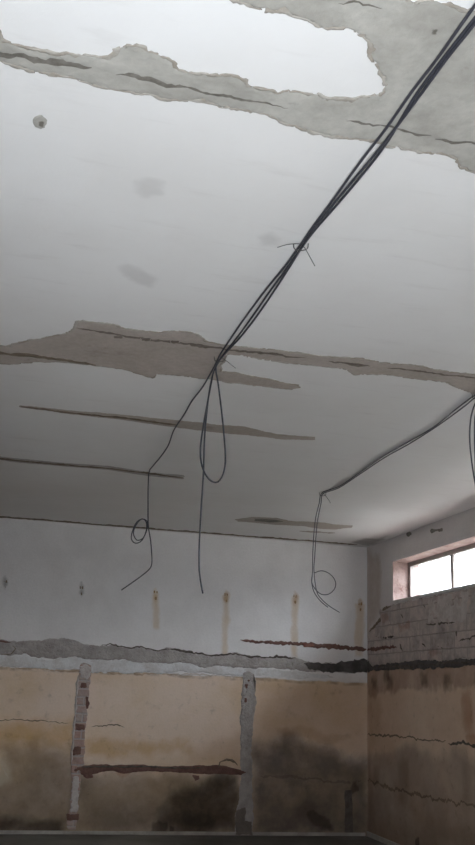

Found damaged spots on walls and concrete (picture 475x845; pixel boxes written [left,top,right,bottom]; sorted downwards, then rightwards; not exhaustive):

spalling [0,0,475,174]
spalling [0,320,475,395]
spalling [19,405,315,440]
spalling [0,456,185,479]
spalling [235,517,353,534]
rust [218,588,233,654]
flaking render [368,587,475,666]
peeling [0,653,345,688]
water stain [0,707,241,832]
water stain [251,658,475,845]
crack [367,733,475,748]
crack [367,778,475,808]